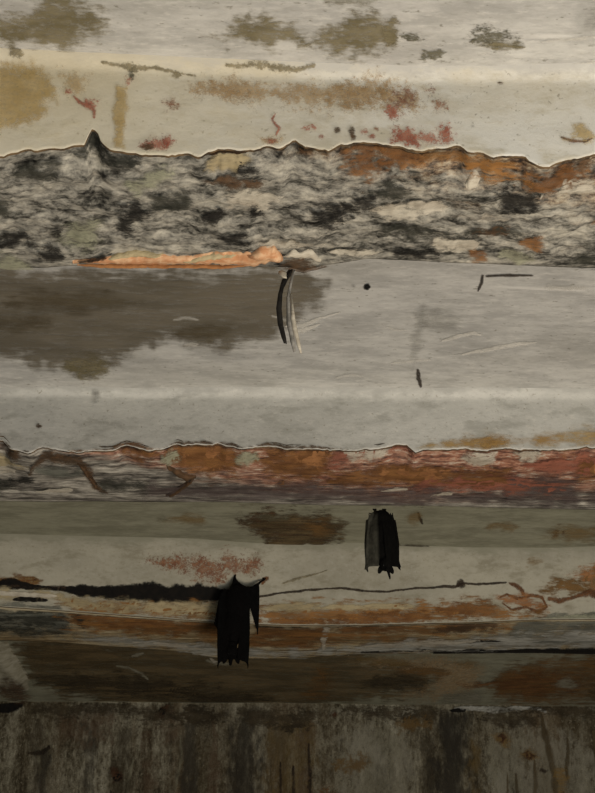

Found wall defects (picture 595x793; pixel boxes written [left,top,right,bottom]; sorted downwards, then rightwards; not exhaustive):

water stain [0,0,110,50]
water stain [227,11,424,60]
water stain [469,25,525,53]
peeling [0,63,55,128]
corrosion [380,86,454,148]
corrosion [140,137,177,150]
spalling [0,74,595,354]
water stain [0,267,330,380]
peeling [0,587,64,599]
corrosion [54,596,217,642]
crack [259,570,524,598]
corrosion [250,565,595,652]